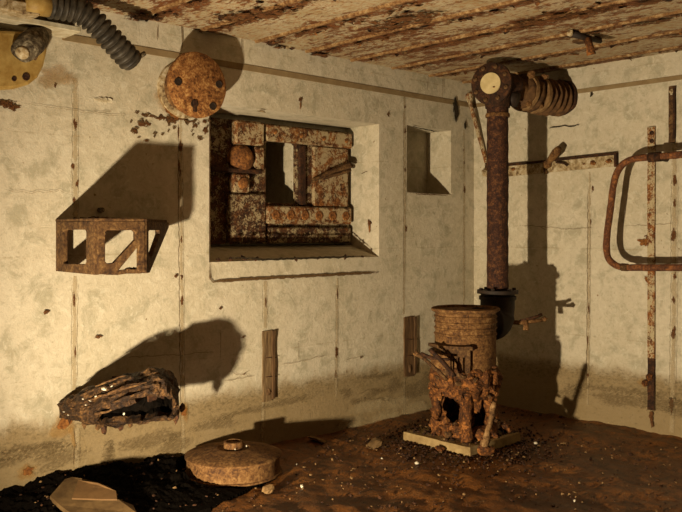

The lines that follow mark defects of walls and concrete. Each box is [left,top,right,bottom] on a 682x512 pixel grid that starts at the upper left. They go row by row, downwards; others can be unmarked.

corrosion [0,100,21,112]